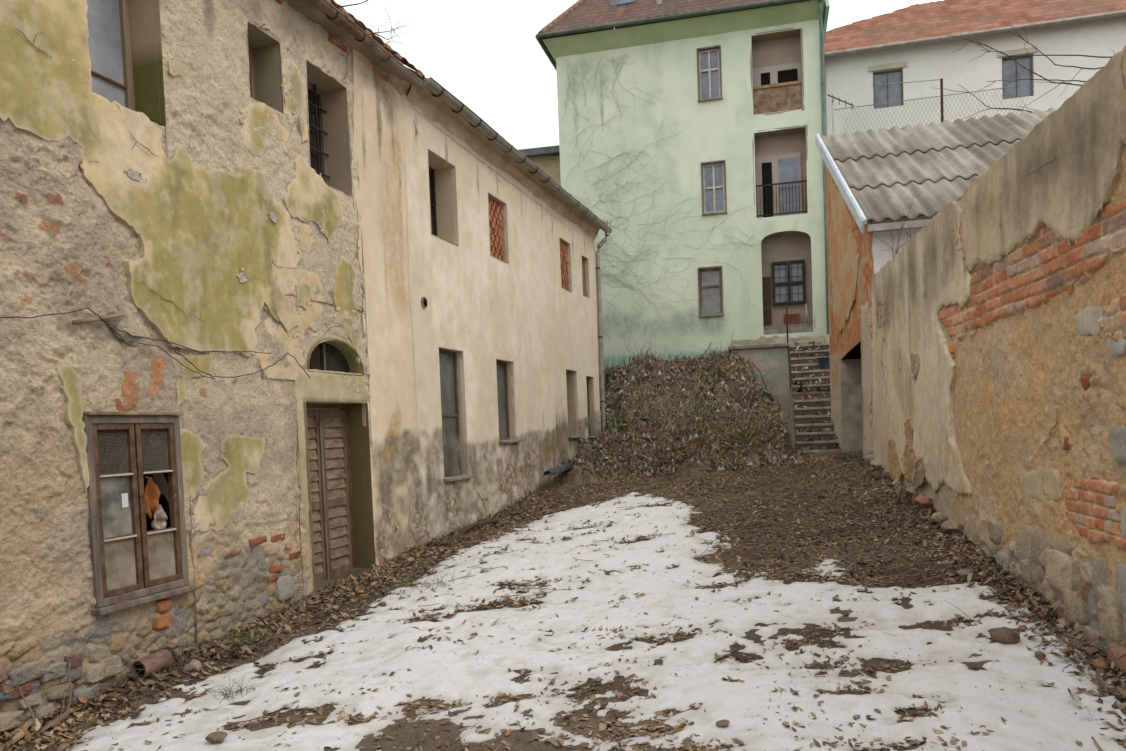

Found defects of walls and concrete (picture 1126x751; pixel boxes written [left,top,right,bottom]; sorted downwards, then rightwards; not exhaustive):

spalling [0,0,372,736]
damp [378,413,600,556]
peeling [733,46,1126,498]
flaking render [1065,474,1126,550]